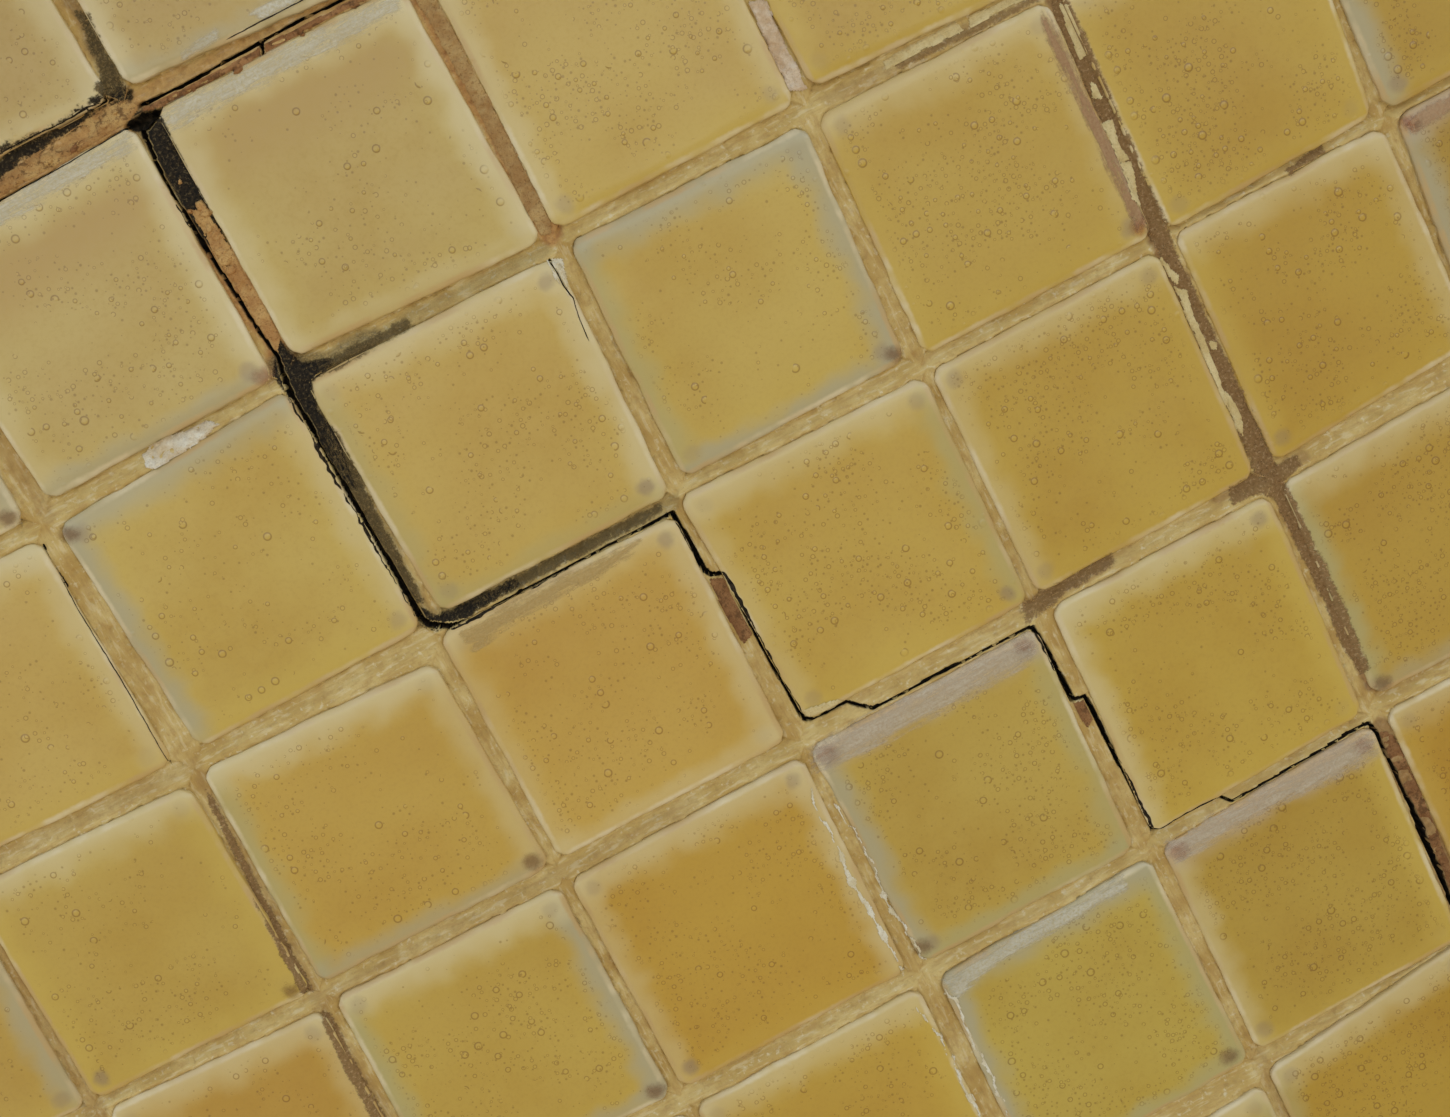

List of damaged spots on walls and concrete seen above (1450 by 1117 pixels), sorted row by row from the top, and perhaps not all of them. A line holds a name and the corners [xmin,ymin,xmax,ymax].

crack [0,0,1215,829]
crack [1219,721,1450,905]